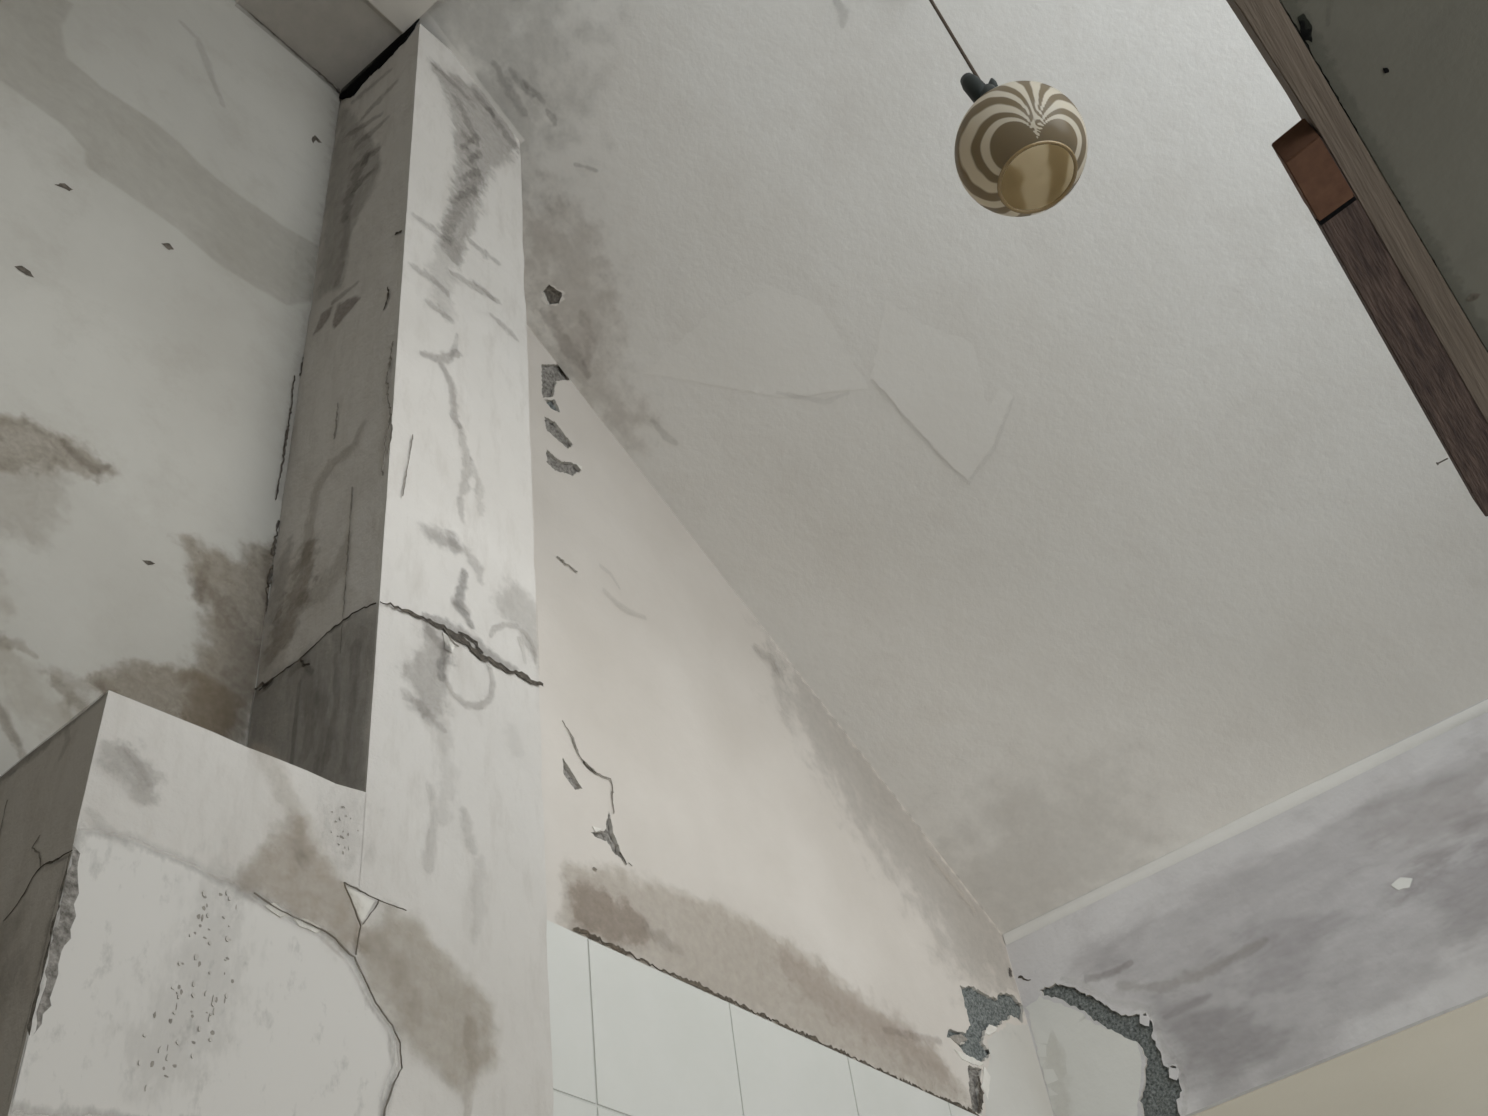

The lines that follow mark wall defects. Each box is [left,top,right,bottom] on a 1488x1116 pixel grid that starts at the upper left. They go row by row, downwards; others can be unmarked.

spalling [544,285,562,304]
spalling [541,366,582,476]
crack [254,287,544,691]
crack [562,720,615,814]
crack [3,835,72,922]
crack [254,882,407,1116]
spalling [947,987,1021,1113]
spalling [1042,985,1182,1116]